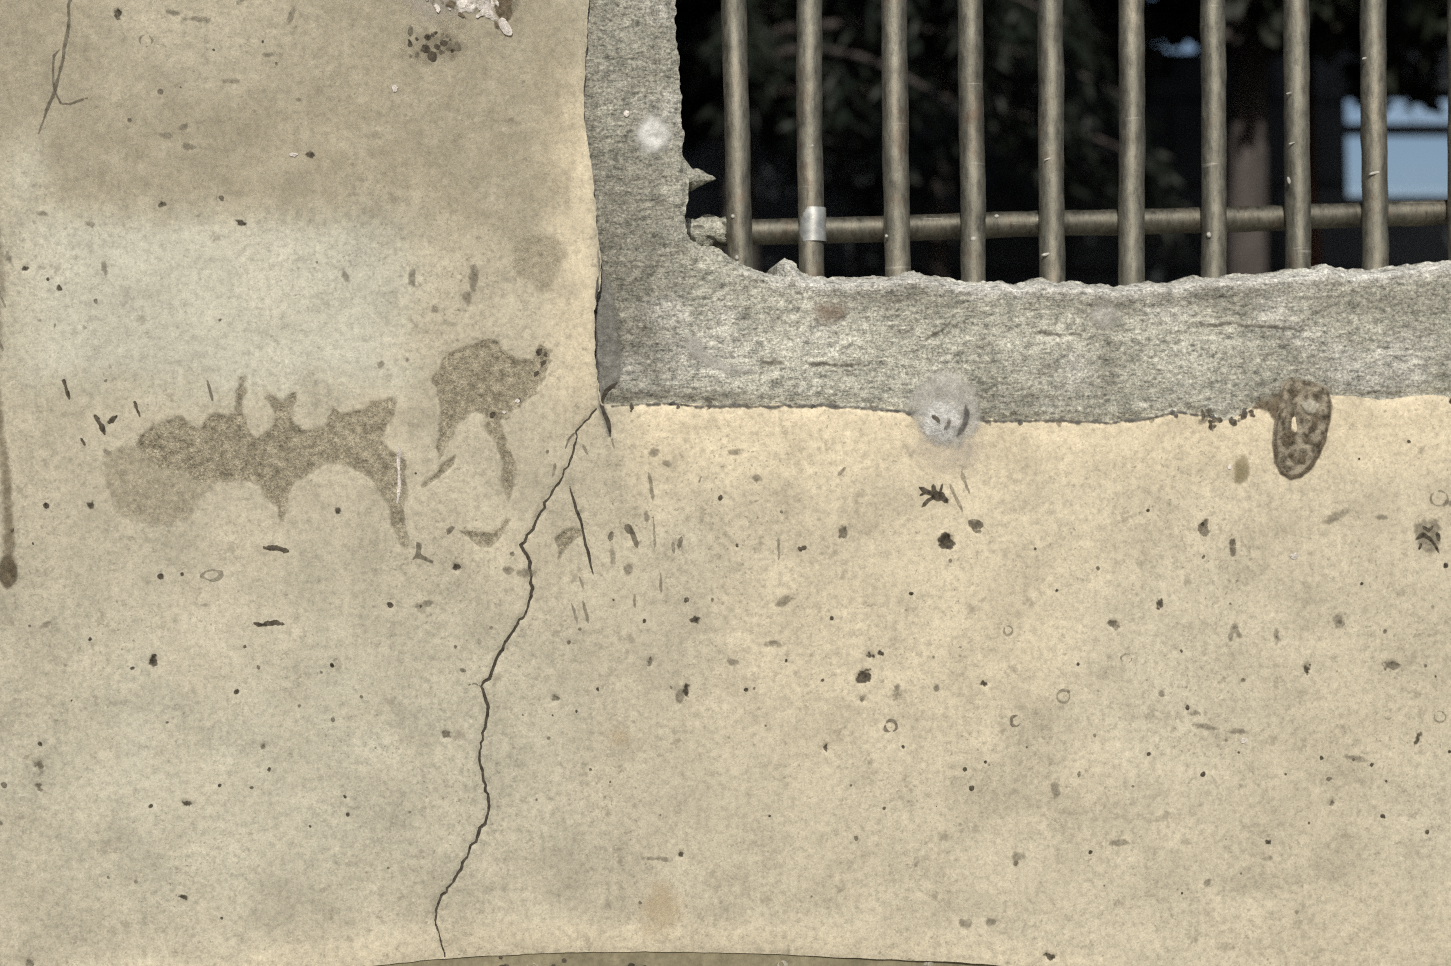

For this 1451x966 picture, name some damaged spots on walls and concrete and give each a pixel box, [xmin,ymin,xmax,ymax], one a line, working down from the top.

spalling [407,25,461,62]
spalling [433,0,512,35]
leakage [0,410,17,587]
spalling [93,414,118,435]
peeling [108,339,550,563]
crack [434,276,617,957]